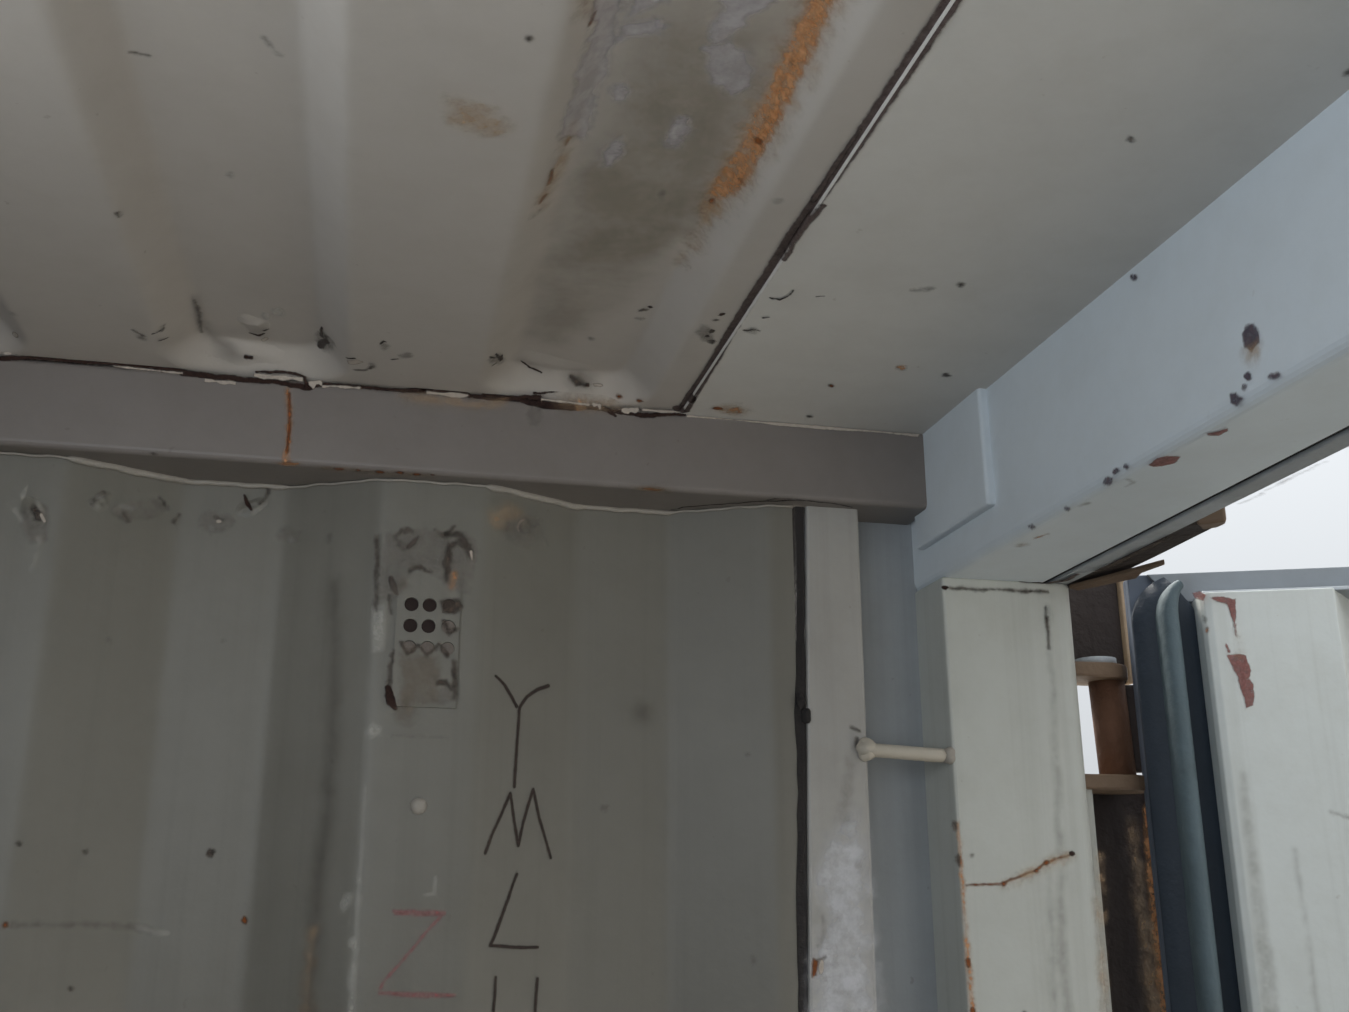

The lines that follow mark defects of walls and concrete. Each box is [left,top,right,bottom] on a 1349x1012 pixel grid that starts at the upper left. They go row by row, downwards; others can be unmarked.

rust [710,0,832,203]